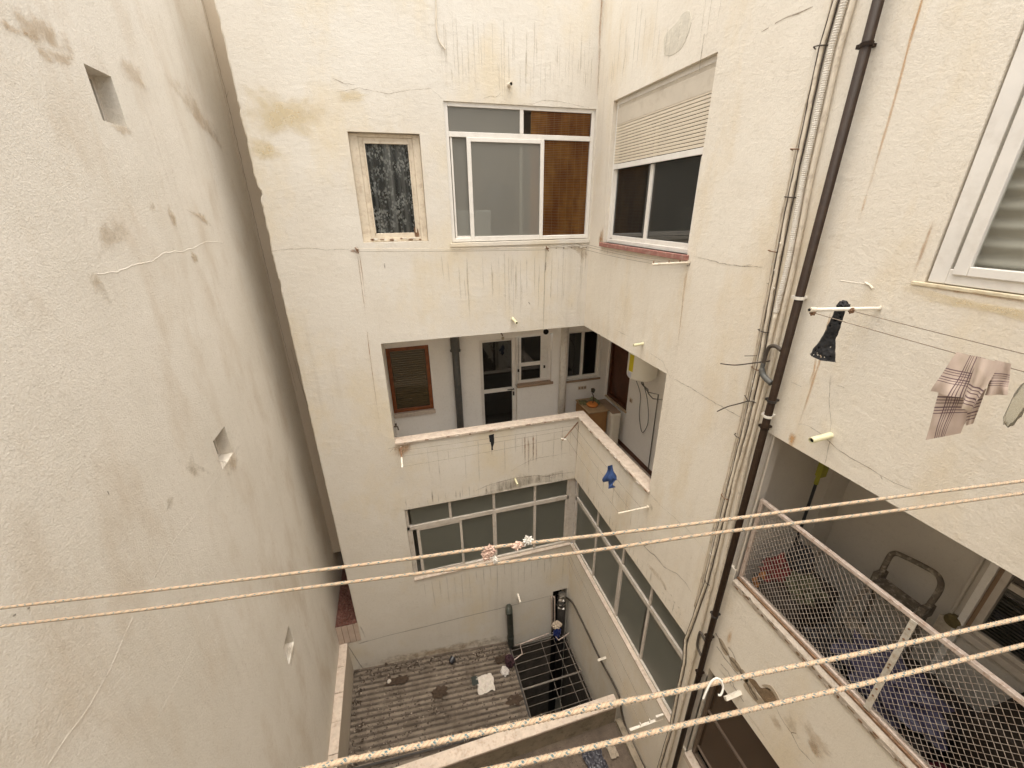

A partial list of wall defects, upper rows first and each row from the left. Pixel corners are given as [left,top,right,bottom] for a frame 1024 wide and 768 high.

peeling [734,586,906,768]